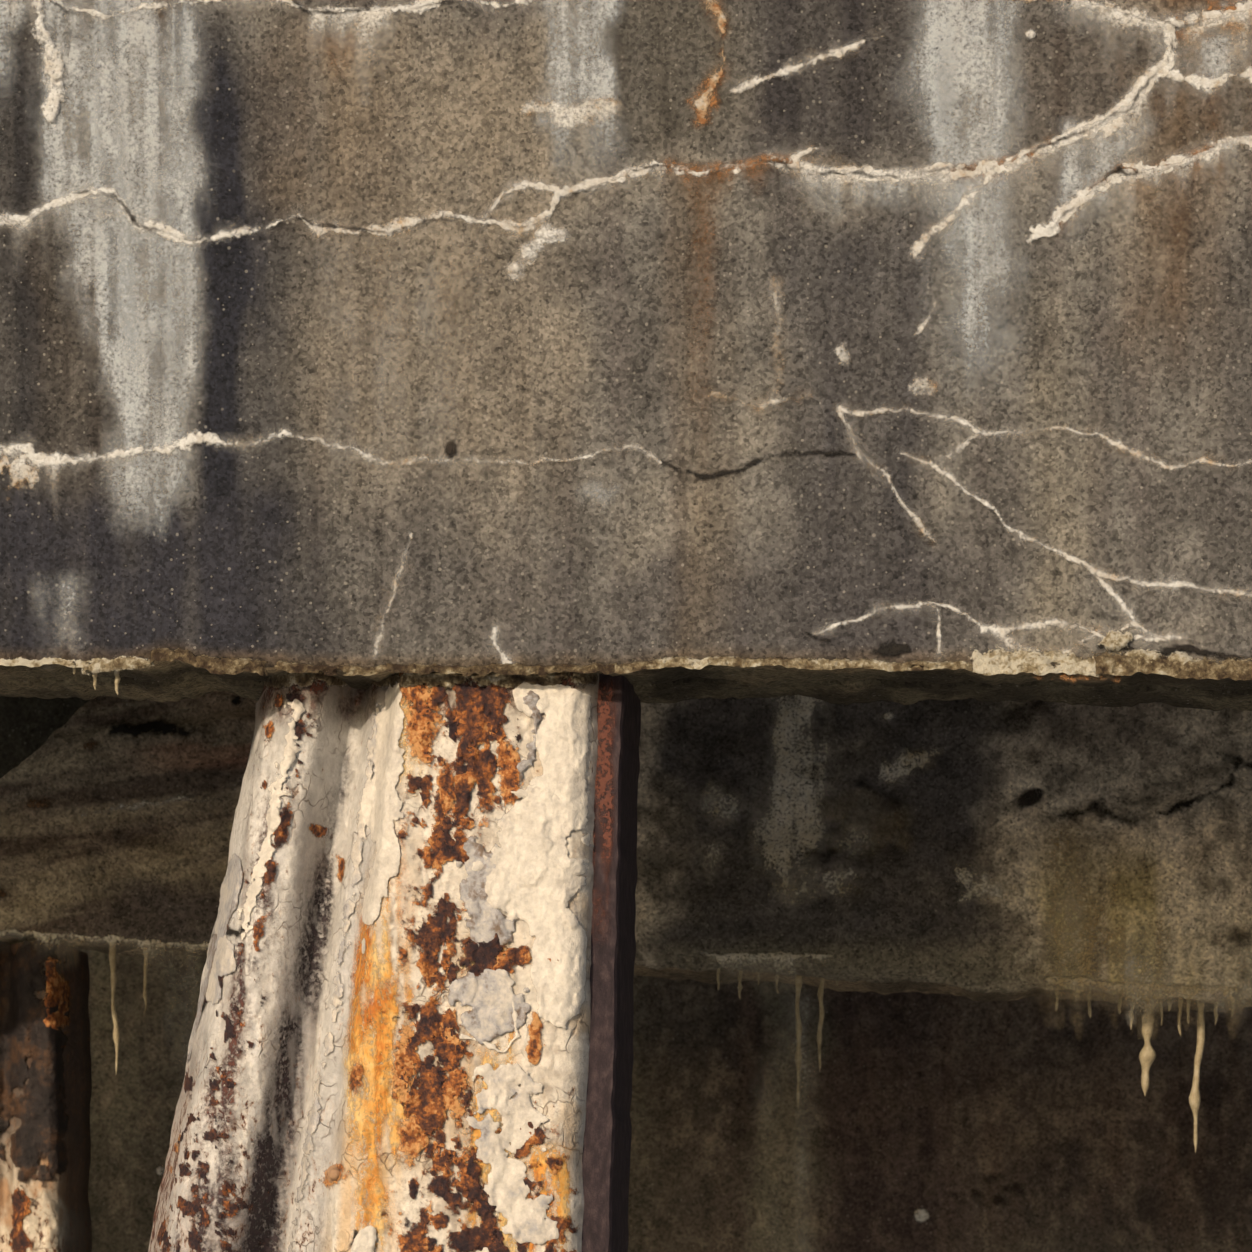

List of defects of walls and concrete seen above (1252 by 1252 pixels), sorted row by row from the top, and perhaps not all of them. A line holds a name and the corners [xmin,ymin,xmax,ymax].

damp [41,0,204,520]
damp [509,224,566,279]
damp [523,0,618,145]
crack [0,0,1252,257]
damp [911,0,1035,367]
crack [491,627,512,664]
crack [0,406,1252,654]
corrosion [309,824,327,838]
corrosion [319,673,579,1252]
peeling [0,630,1252,1252]
damp [753,695,867,904]
crack [1061,755,1252,823]